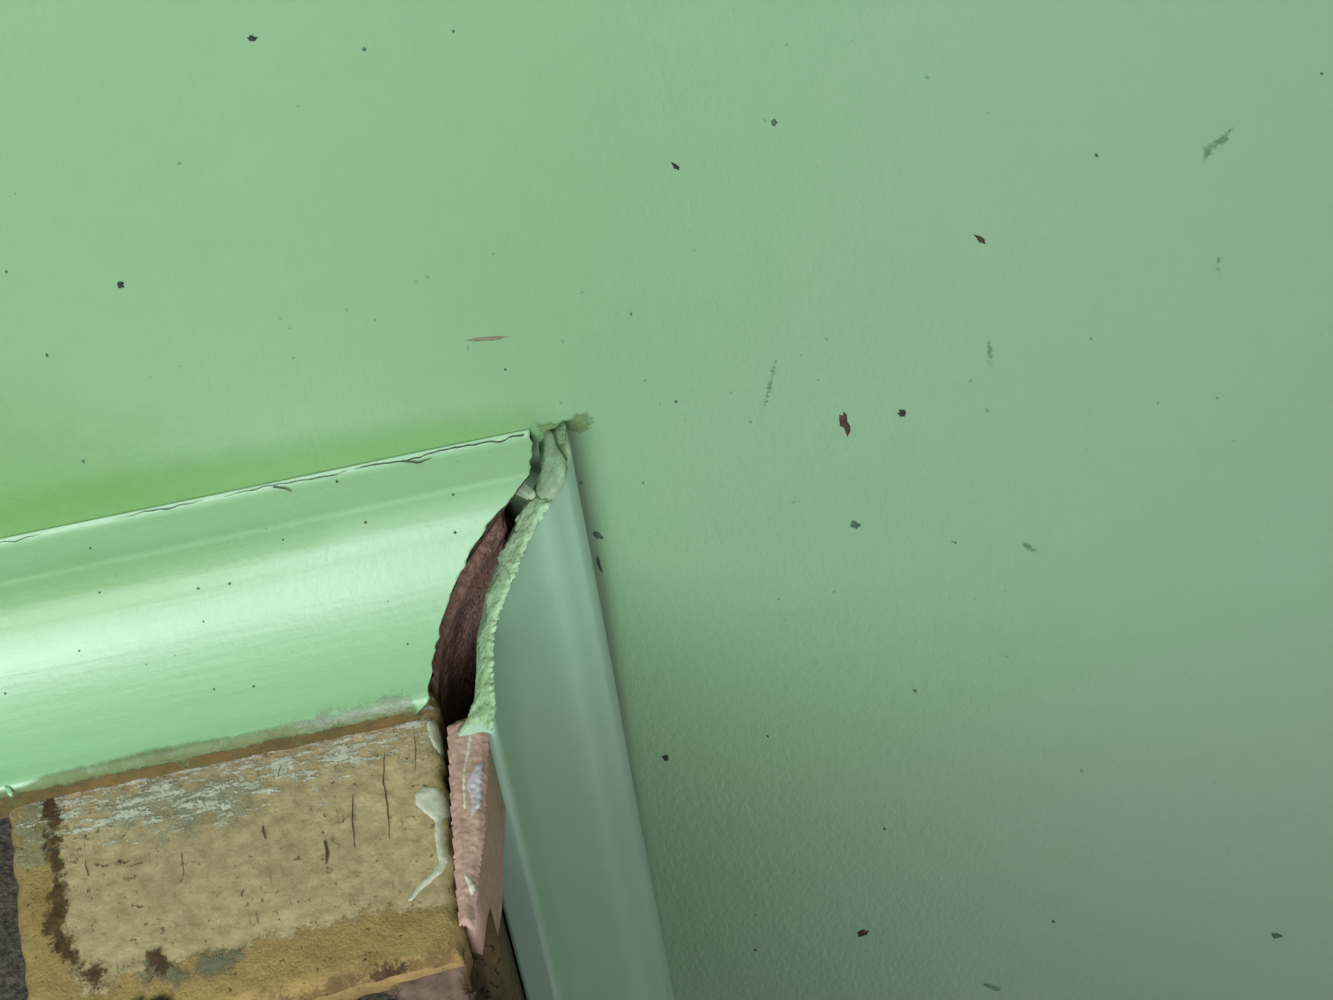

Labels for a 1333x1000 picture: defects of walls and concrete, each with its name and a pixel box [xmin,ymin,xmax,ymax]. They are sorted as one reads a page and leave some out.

peeling [516,482,536,500]
water stain [40,796,108,990]